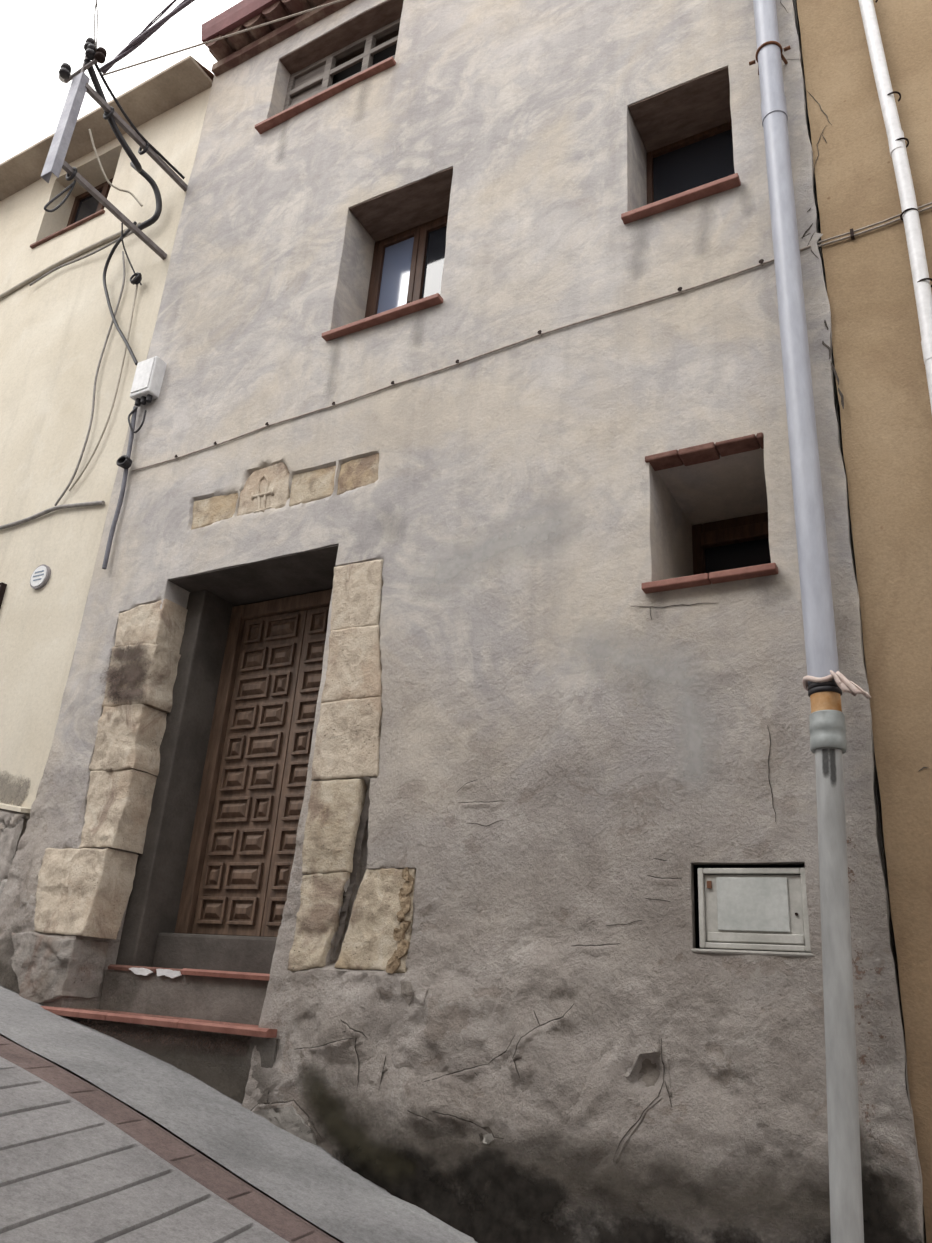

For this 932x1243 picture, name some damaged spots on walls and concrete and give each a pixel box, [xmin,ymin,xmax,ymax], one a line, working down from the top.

crack [638,603,703,620]
crack [767,725,776,822]
crack [295,1019,392,1089]
crack [407,1004,578,1146]
spalling [619,1032,660,1087]
crack [614,1038,672,1159]
water stain [310,1094,831,1243]
water stain [859,1125,923,1243]